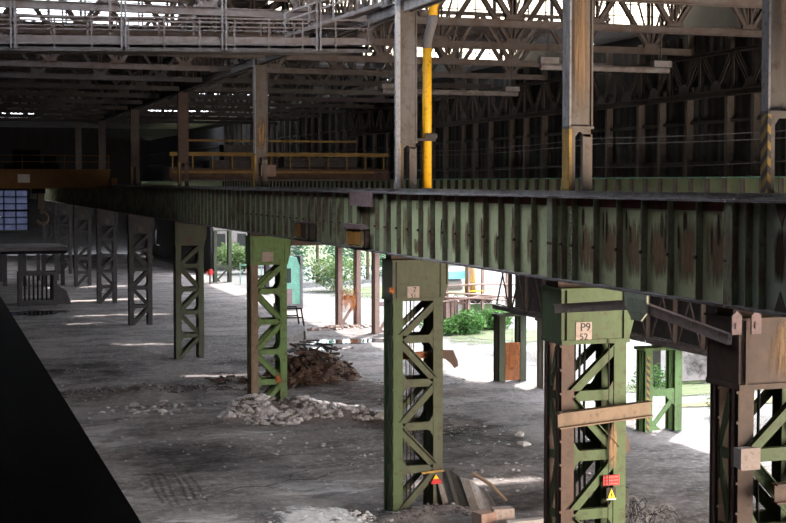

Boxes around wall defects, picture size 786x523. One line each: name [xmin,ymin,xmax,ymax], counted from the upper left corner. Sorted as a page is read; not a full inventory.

corrosion [580,209,593,270]
corrosion [602,209,616,270]